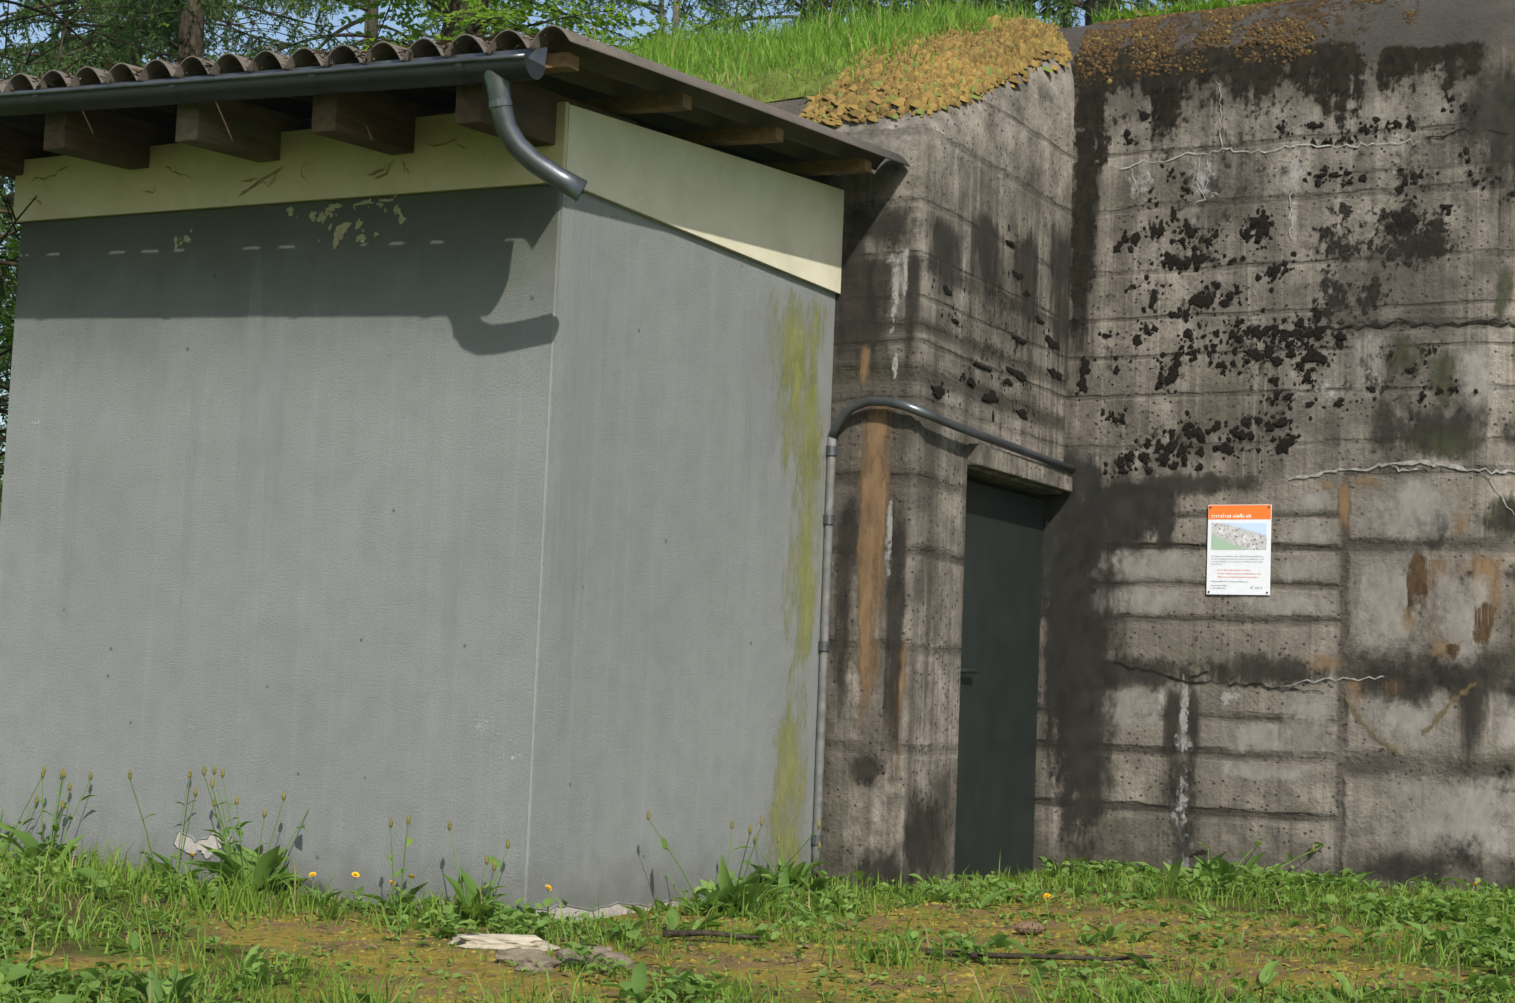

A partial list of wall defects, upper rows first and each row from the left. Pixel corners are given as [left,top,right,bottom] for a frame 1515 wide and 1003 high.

peeling [286,195,406,250]
corrosion [860,344,870,382]
water stain [768,92,1112,662]
water stain [1350,334,1515,460]
crack [1288,459,1515,514]
corrosion [857,406,893,706]
water stain [883,500,906,741]
corrosion [891,644,907,754]
water stain [1031,452,1257,871]
crack [1113,661,1384,693]
corrosion [1405,551,1501,660]
peeling [173,828,236,860]